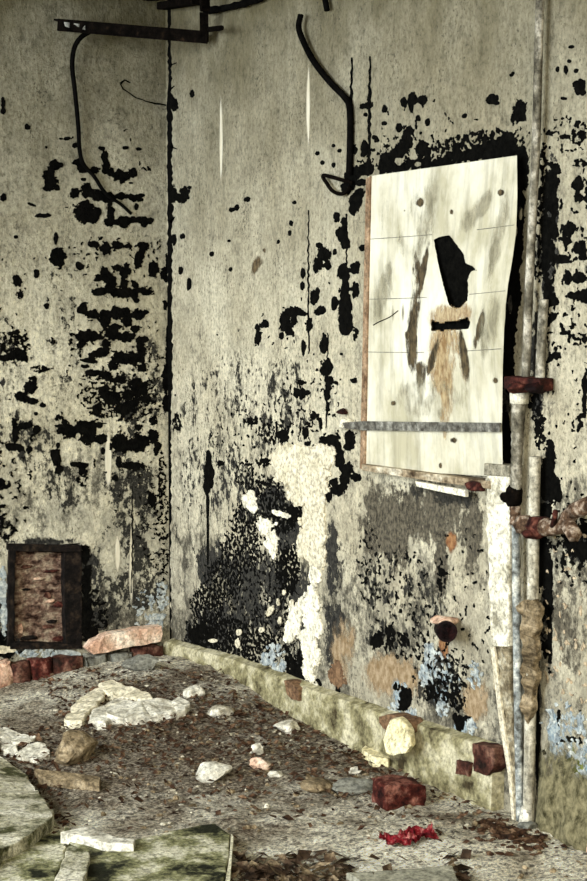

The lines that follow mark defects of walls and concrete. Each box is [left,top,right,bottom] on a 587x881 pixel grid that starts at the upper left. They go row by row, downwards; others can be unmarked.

peeling [168,184,192,204]
peeling [555,45,586,100]
peeling [0,326,50,540]
peeling [12,129,185,642]
water stain [173,352,314,670]
peeling [181,92,587,693]
peeling [356,522,516,820]
peeling [535,518,587,796]